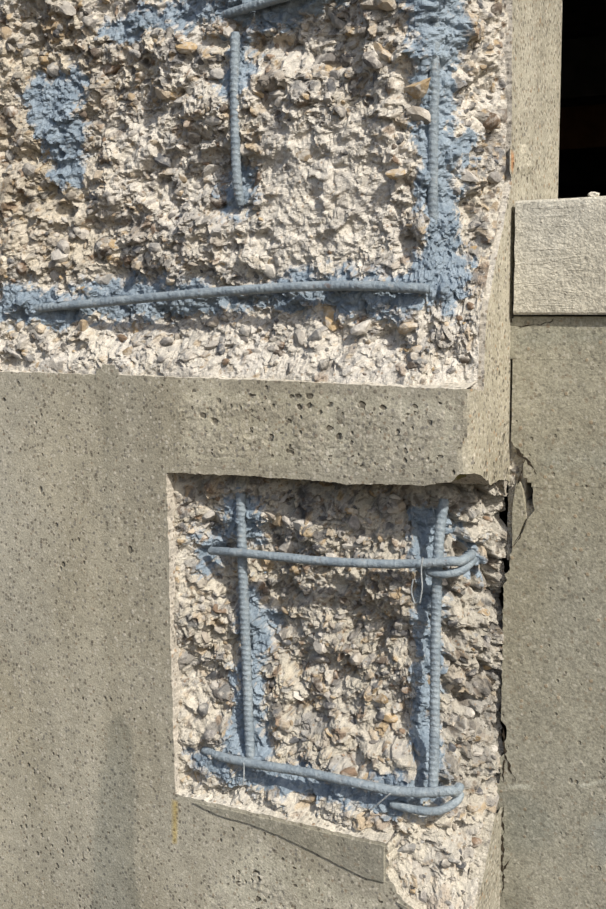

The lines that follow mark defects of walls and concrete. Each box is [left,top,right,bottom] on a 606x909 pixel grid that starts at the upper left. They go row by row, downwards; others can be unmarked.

spalling [0,0,535,391]
spalling [176,396,446,471]
crack [512,444,536,485]
spalling [166,433,534,909]
crack [502,729,516,782]
crack [500,806,509,896]